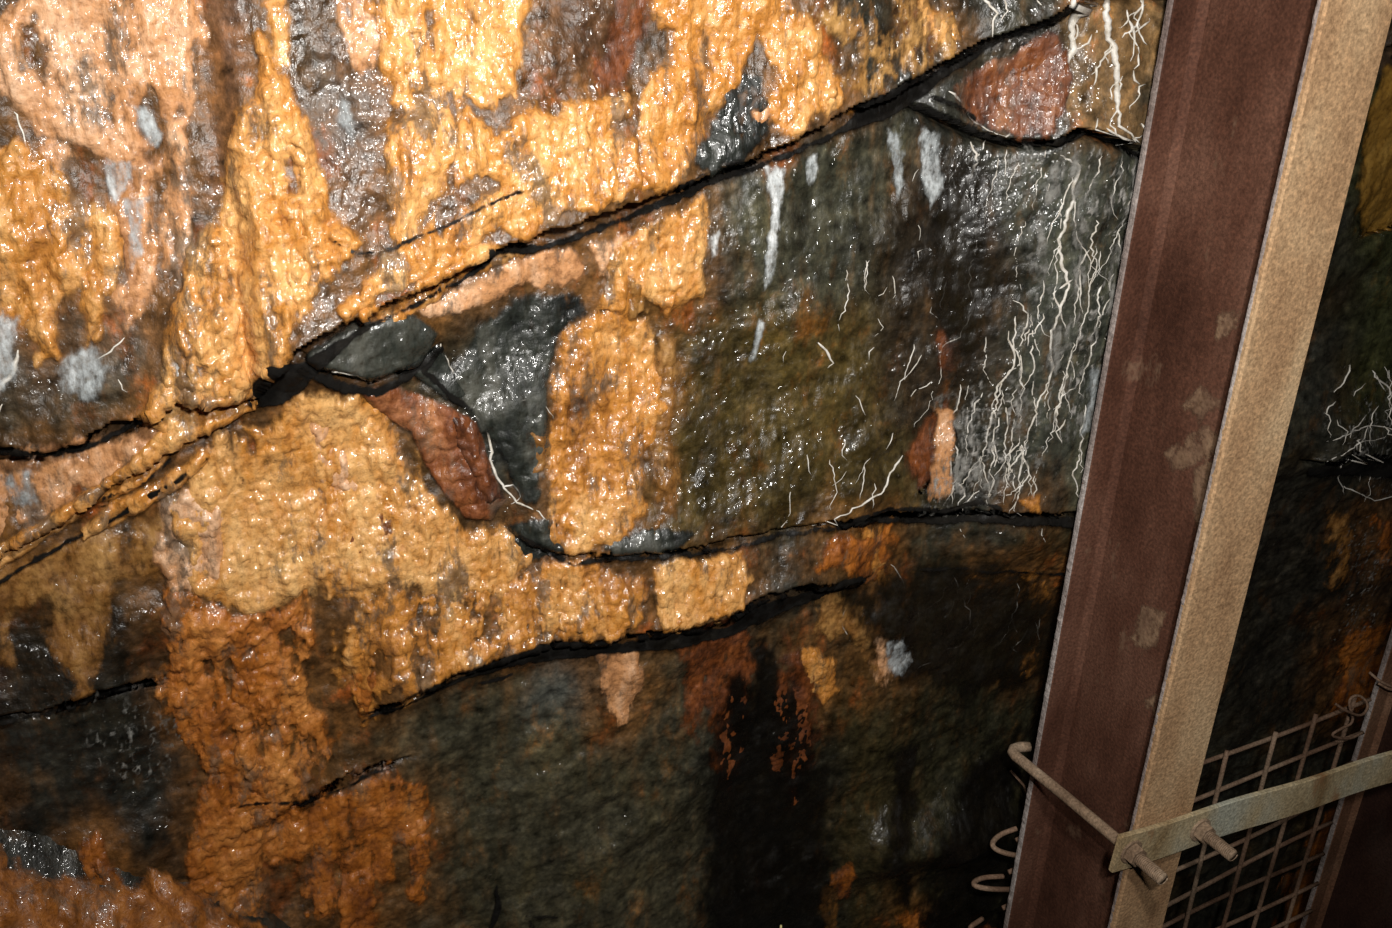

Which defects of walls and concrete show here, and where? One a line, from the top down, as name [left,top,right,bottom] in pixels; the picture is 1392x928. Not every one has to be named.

crack [248,0,1140,410]
leakage [765,166,784,277]
leakage [888,133,903,193]
leakage [919,130,1004,358]
crack [0,419,143,457]
corrosion [380,514,391,535]
crack [518,499,1076,566]
crack [362,576,866,723]
corrosion [677,624,757,780]
corrosion [770,637,822,779]
corrosion [300,761,434,928]
leakage [697,636,856,928]